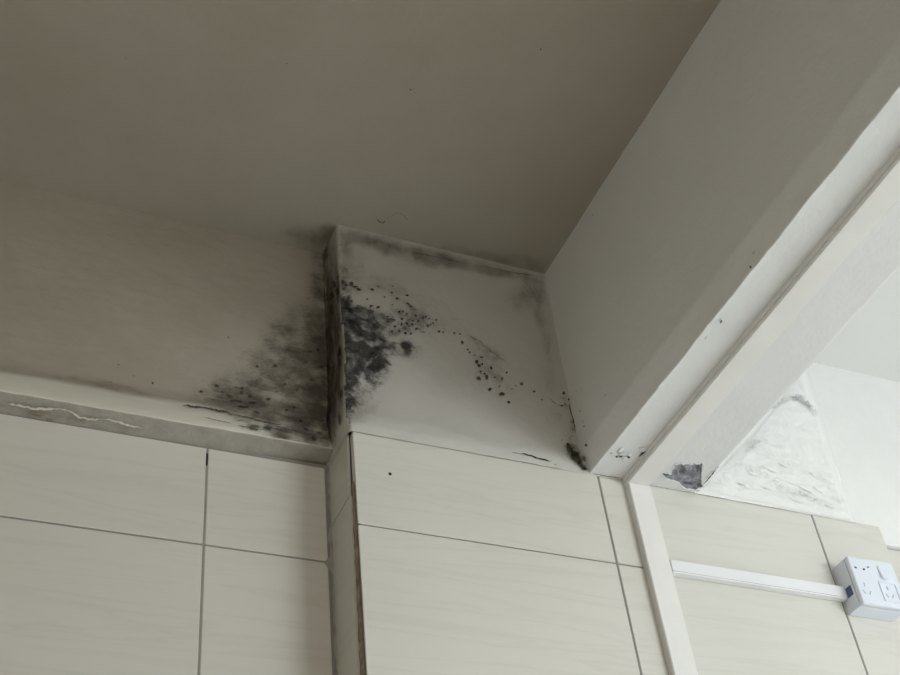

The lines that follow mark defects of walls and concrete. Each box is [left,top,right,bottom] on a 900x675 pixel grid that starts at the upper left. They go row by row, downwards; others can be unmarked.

damp [184,248,510,443]
damp [566,443,587,470]
peeling [662,379,852,520]